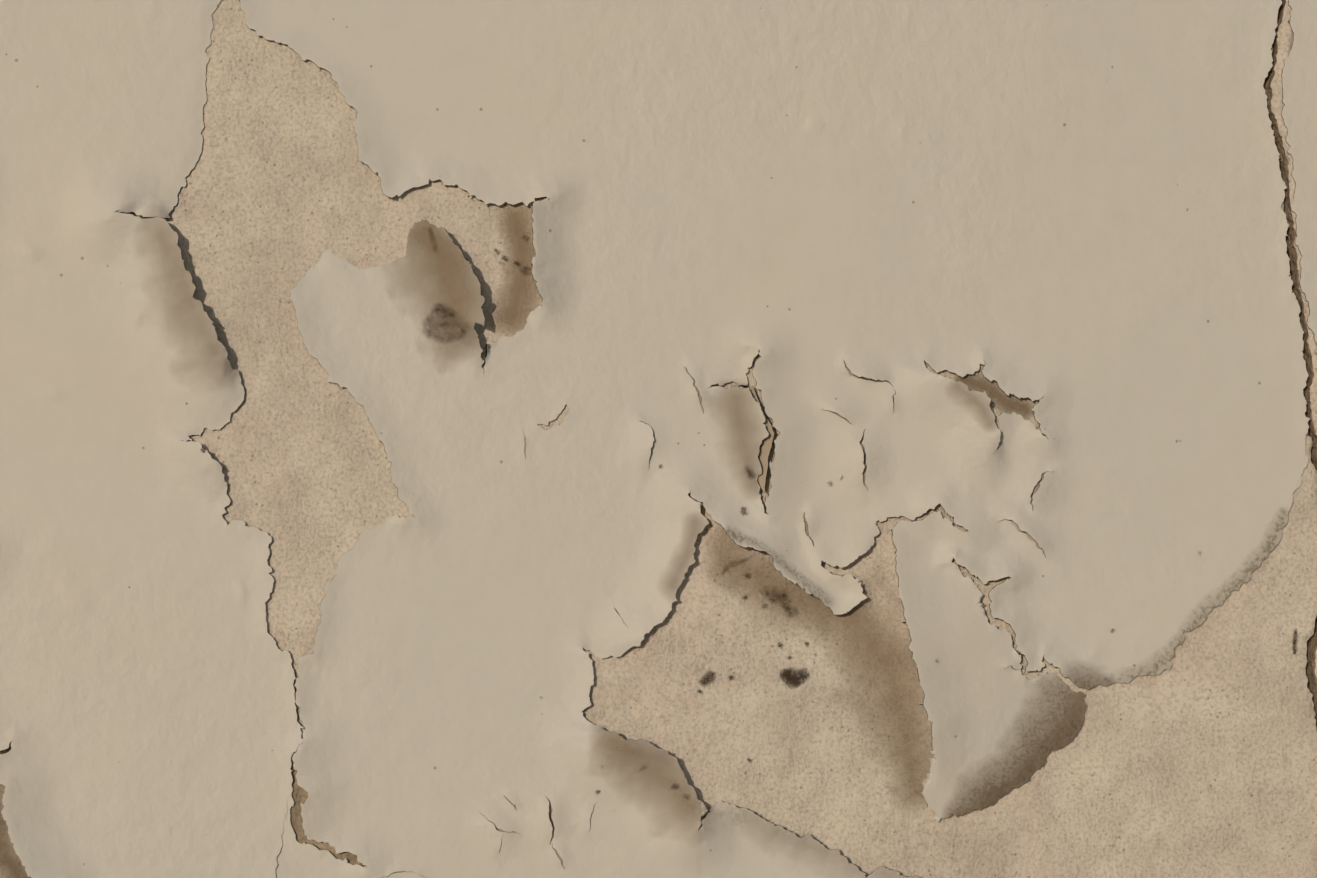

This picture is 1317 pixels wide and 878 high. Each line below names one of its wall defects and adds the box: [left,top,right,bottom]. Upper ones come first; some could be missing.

peeling [0,674,101,878]
crack [273,807,294,878]
peeling [55,0,589,878]
peeling [533,307,1317,878]
crack [1249,0,1317,471]
crack [1305,616,1317,728]